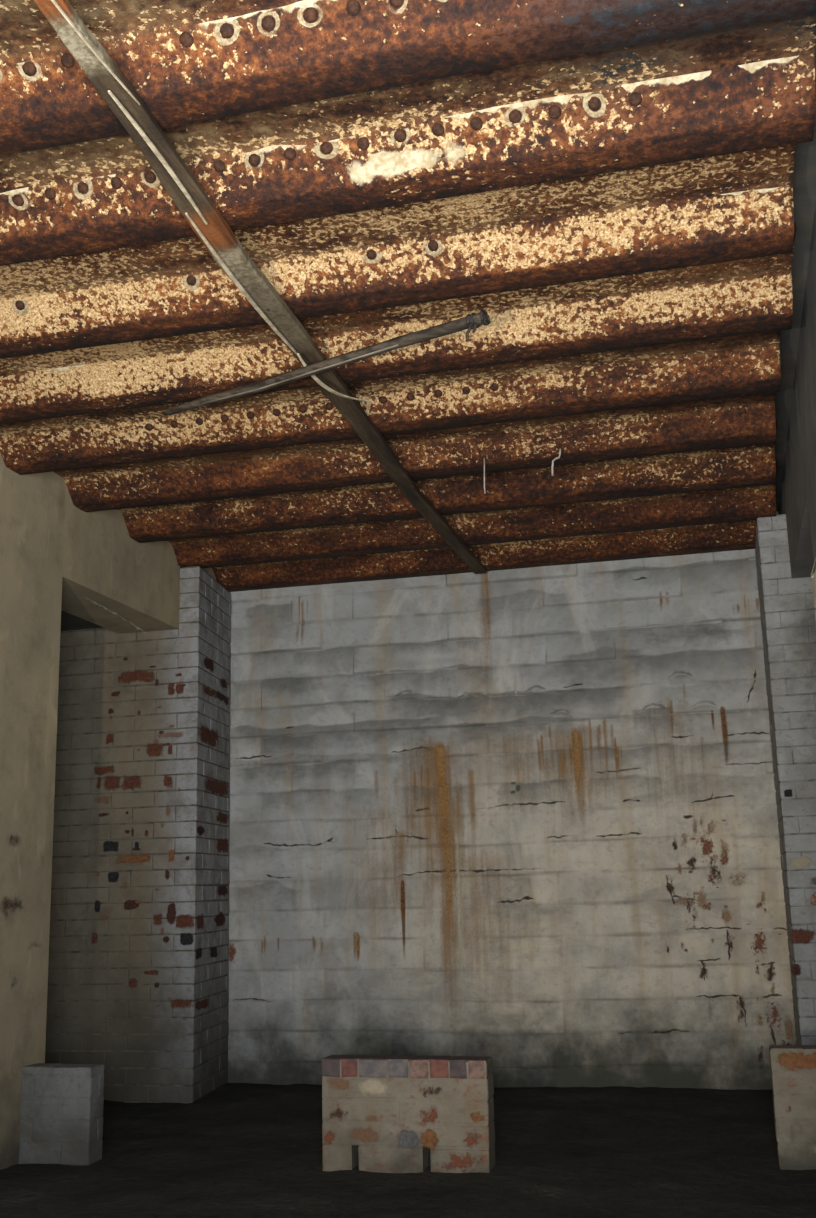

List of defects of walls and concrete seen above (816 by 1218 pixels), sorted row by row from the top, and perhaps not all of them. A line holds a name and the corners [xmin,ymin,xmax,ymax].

peeling [347,142,465,184]
peeling [109,657,186,719]
corrosion [560,721,618,791]
crack [728,732,770,764]
crack [264,838,334,846]
crack [371,808,429,839]
corrosion [414,746,455,948]
crack [397,868,538,903]
spalling [667,815,744,928]
crack [692,794,733,803]
peeling [154,903,236,961]
peeling [737,924,816,1070]